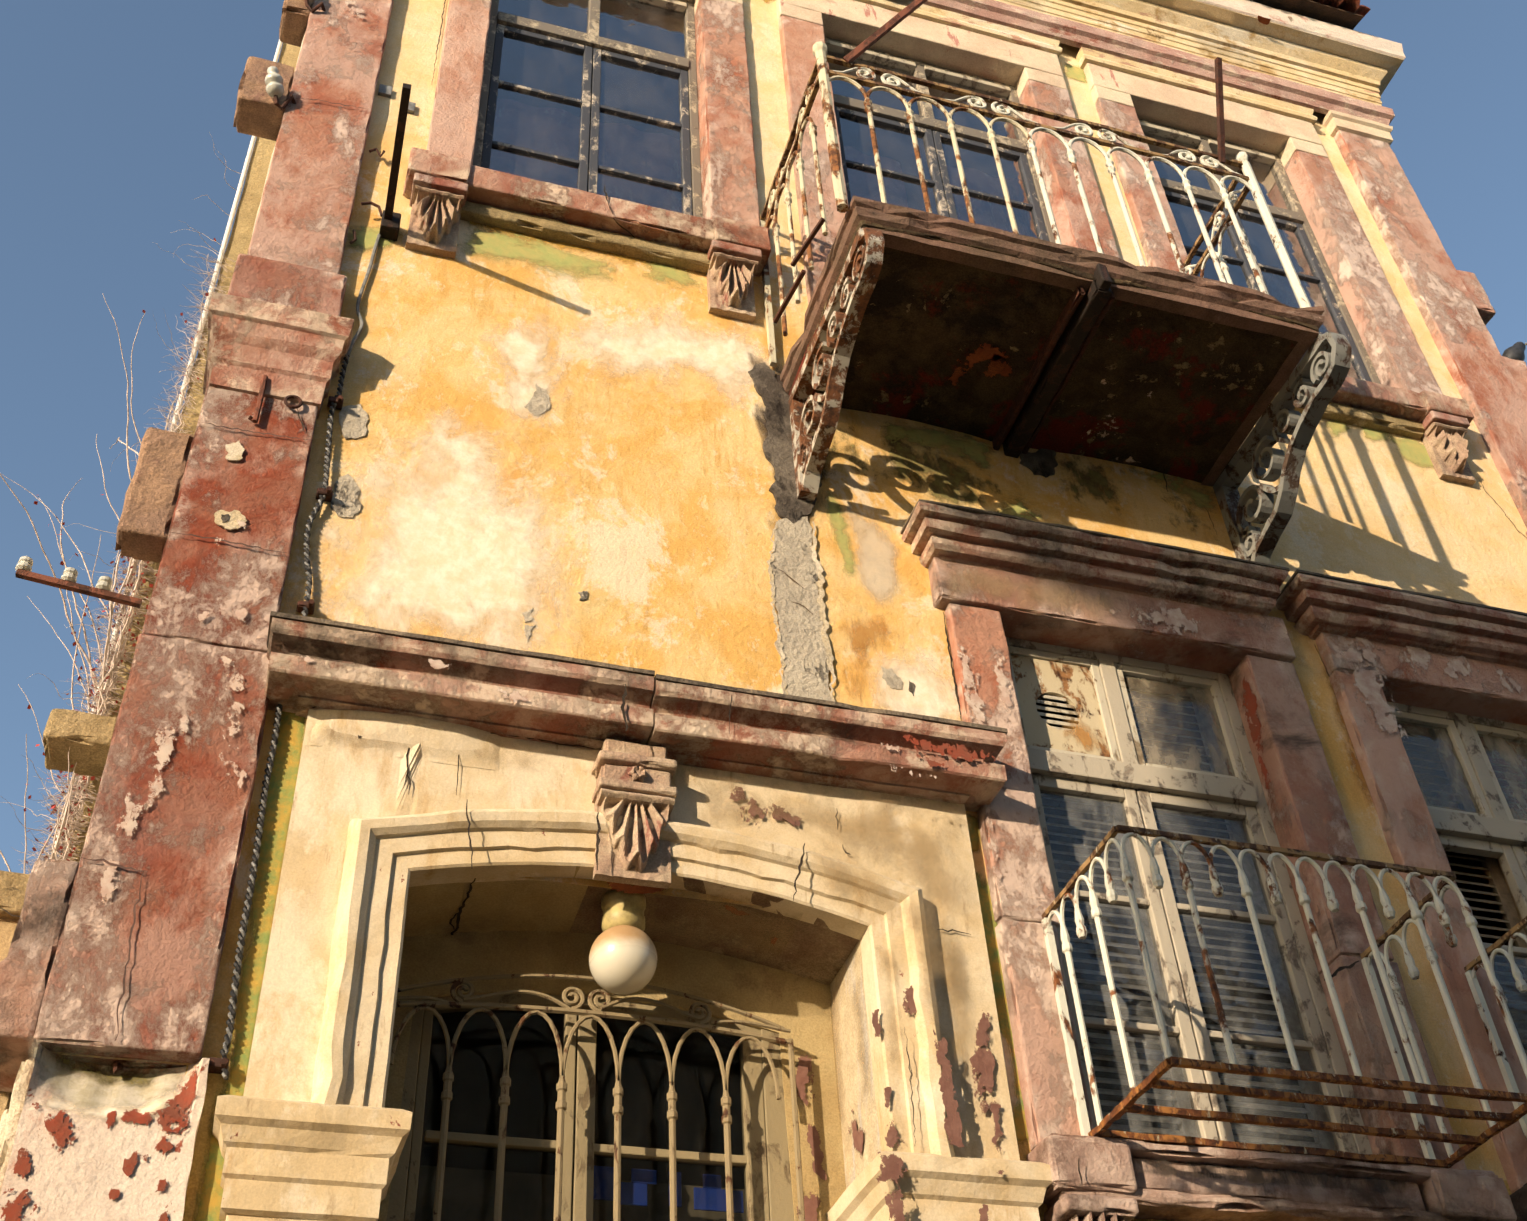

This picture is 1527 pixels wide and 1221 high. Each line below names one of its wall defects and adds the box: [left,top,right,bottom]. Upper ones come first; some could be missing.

water stain [829,438,858,467]
water stain [884,423,1041,520]
mould [1062,461,1119,510]
peeling [98,710,191,903]
peeling [219,656,247,802]
crack [403,747,411,795]
peeling [428,659,449,669]
crack [449,755,476,935]
crack [81,857,144,1041]
spalling [0,1047,199,1221]
peeling [848,1087,908,1221]
peeling [933,1010,1003,1151]